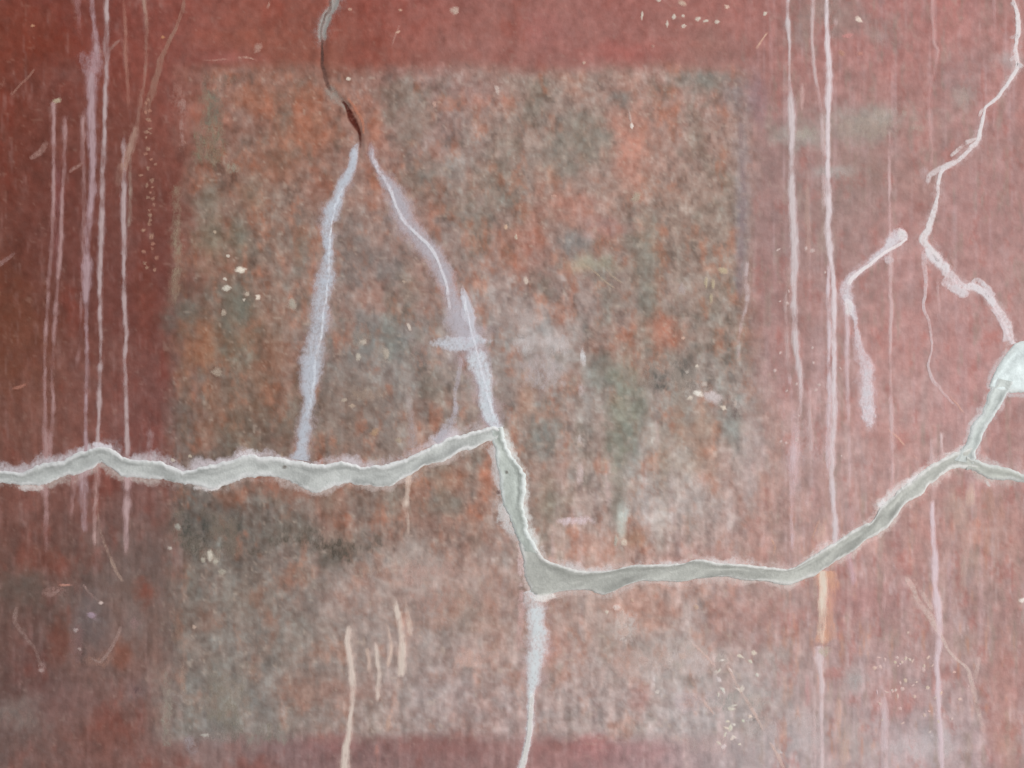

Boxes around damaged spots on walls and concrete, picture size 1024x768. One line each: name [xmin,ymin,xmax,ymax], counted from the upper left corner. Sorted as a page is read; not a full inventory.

damp [52,167,63,278]
damp [52,99,67,145]
damp [81,43,108,351]
damp [121,182,131,277]
damp [121,128,148,169]
crack [319,0,364,141]
damp [789,88,809,314]
damp [811,0,849,543]
damp [84,389,101,451]
crack [0,148,1024,601]
damp [793,329,802,393]
crack [519,606,547,768]